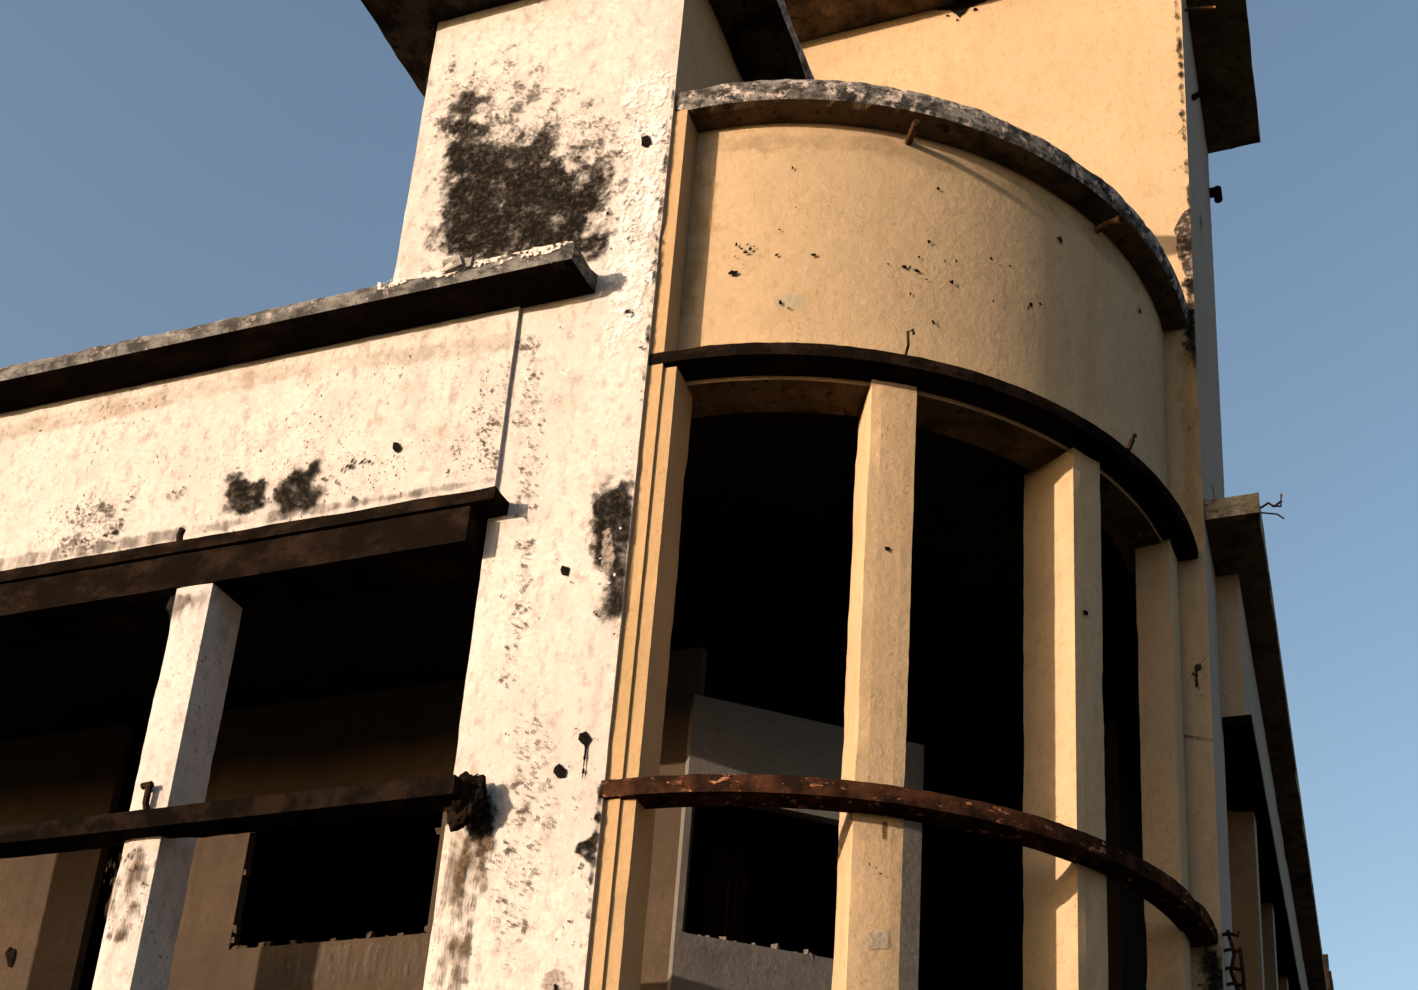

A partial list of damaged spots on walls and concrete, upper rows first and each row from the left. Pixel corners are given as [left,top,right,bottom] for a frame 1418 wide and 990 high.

water stain [427,44,648,261]
water stain [1179,279,1197,366]
water stain [211,452,375,530]
water stain [589,480,634,635]
water stain [470,786,497,874]
water stain [1198,946,1224,990]